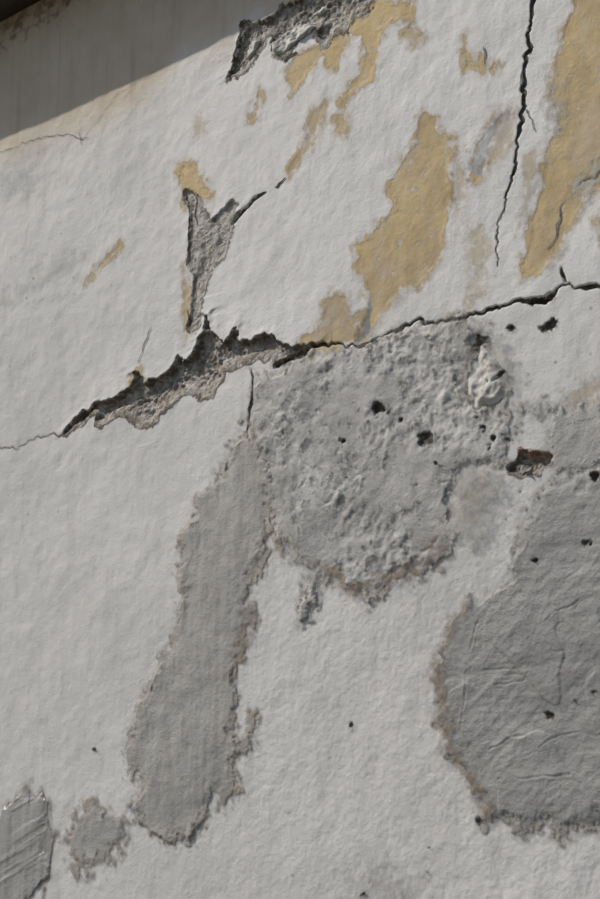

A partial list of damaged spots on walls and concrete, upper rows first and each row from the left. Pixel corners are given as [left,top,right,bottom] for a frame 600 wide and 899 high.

crack [495,0,536,266]
peeling [519,0,600,278]
peeling [63,0,458,438]
crack [547,172,600,250]
crack [306,267,600,349]
spalling [464,334,489,350]
crack [0,432,65,450]
crack [246,370,254,433]
spalling [418,431,433,447]
spalling [475,416,553,479]